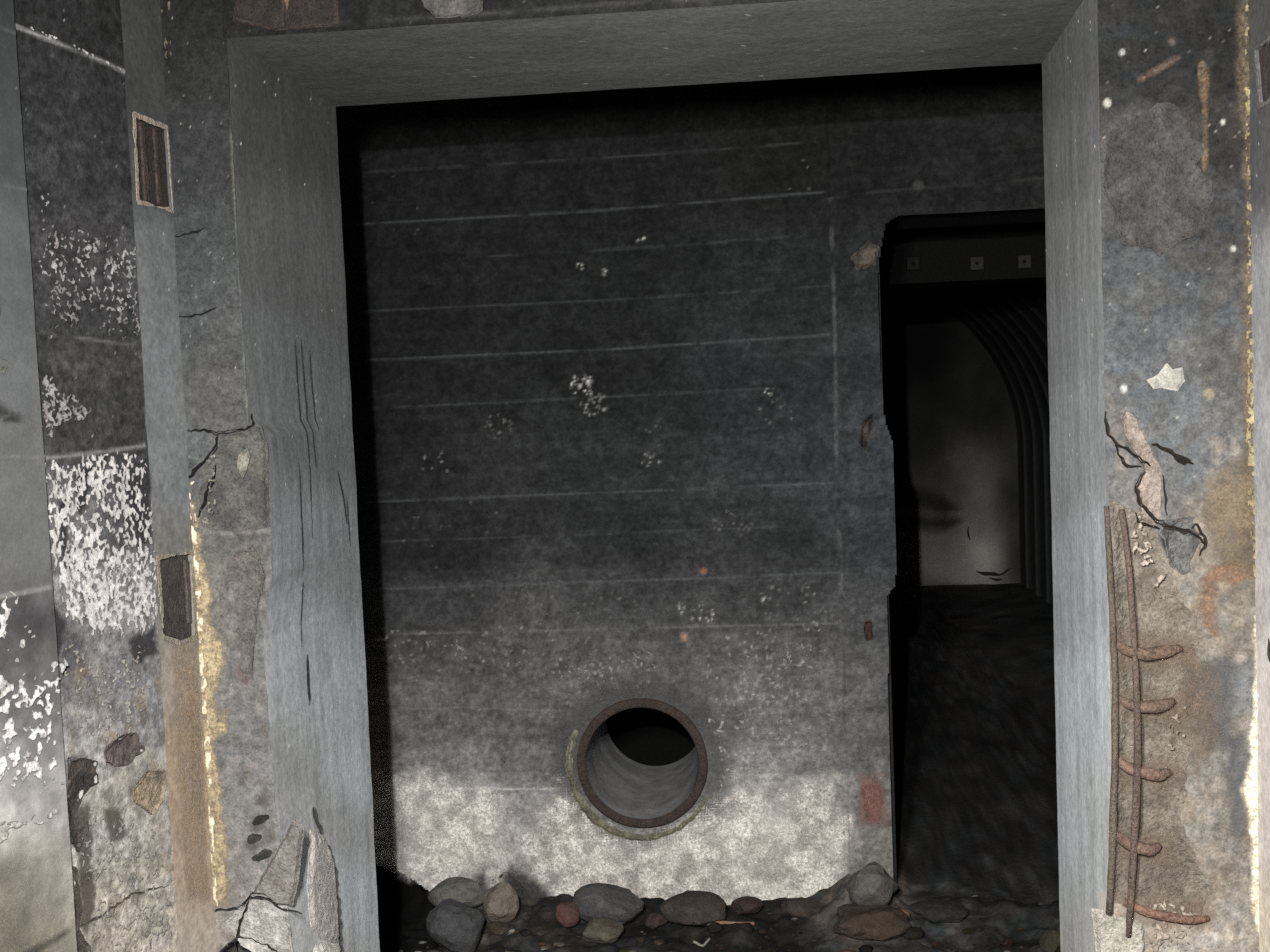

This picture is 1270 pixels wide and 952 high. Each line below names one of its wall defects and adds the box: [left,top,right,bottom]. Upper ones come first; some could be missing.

crack [188,413,254,523]
crack [1104,411,1207,556]
spalling [1110,411,1213,952]
crack [215,885,302,952]
crack [313,807,344,952]